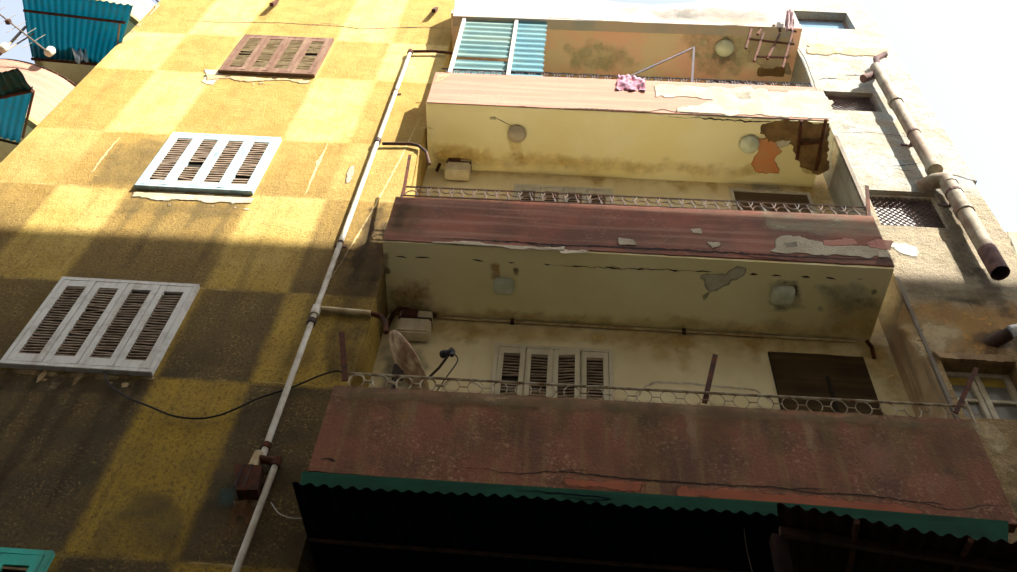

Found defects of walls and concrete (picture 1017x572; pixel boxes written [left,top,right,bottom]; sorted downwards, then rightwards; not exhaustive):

peeling [654,24,834,191]
peeling [770,235,920,266]
flaking render [701,267,746,291]
crack [475,468,1017,520]